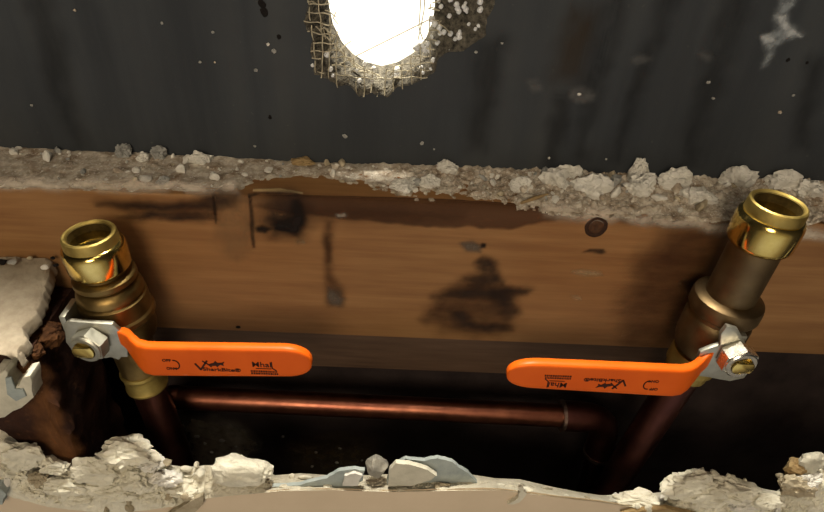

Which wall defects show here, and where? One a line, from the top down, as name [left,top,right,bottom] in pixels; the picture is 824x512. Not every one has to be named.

spalling [304,0,495,97]
water stain [256,198,306,235]
water stain [430,242,526,331]
spalling [0,352,824,512]